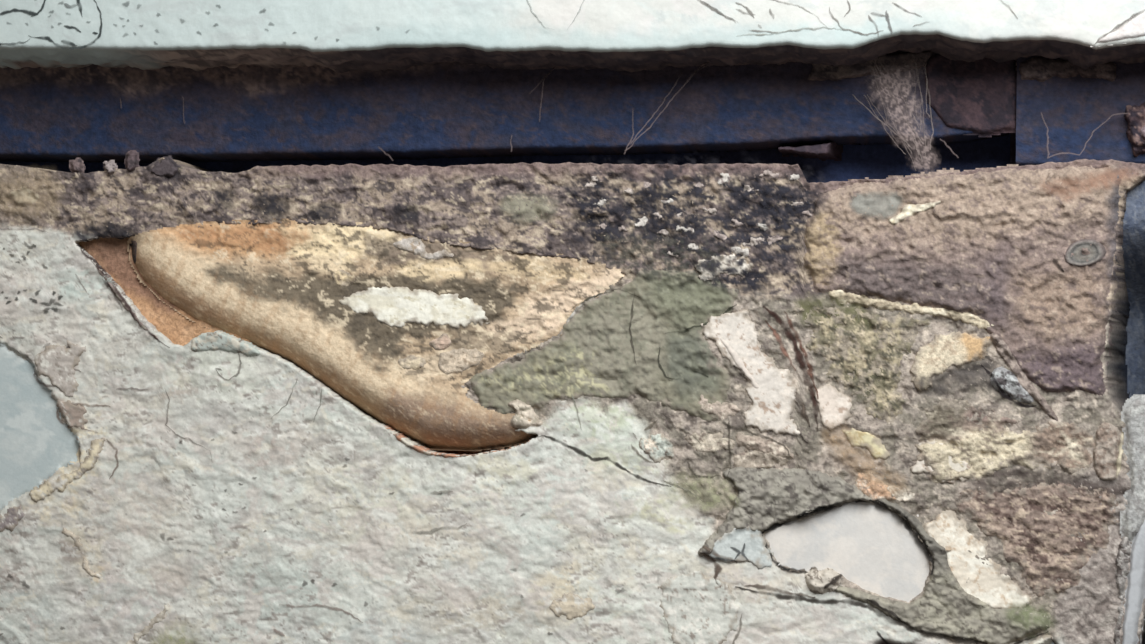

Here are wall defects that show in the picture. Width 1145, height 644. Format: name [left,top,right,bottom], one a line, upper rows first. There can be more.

flaking render [1090,12,1145,47]
damp [76,222,131,242]
mould [255,195,288,220]
mould [310,204,337,220]
mould [566,163,818,292]
peeling [803,164,1129,396]
flaking render [79,219,800,468]
crack [763,306,818,427]
peeling [0,340,105,532]
crack [539,395,791,501]
peeling [707,385,1032,609]
peeling [658,571,740,644]